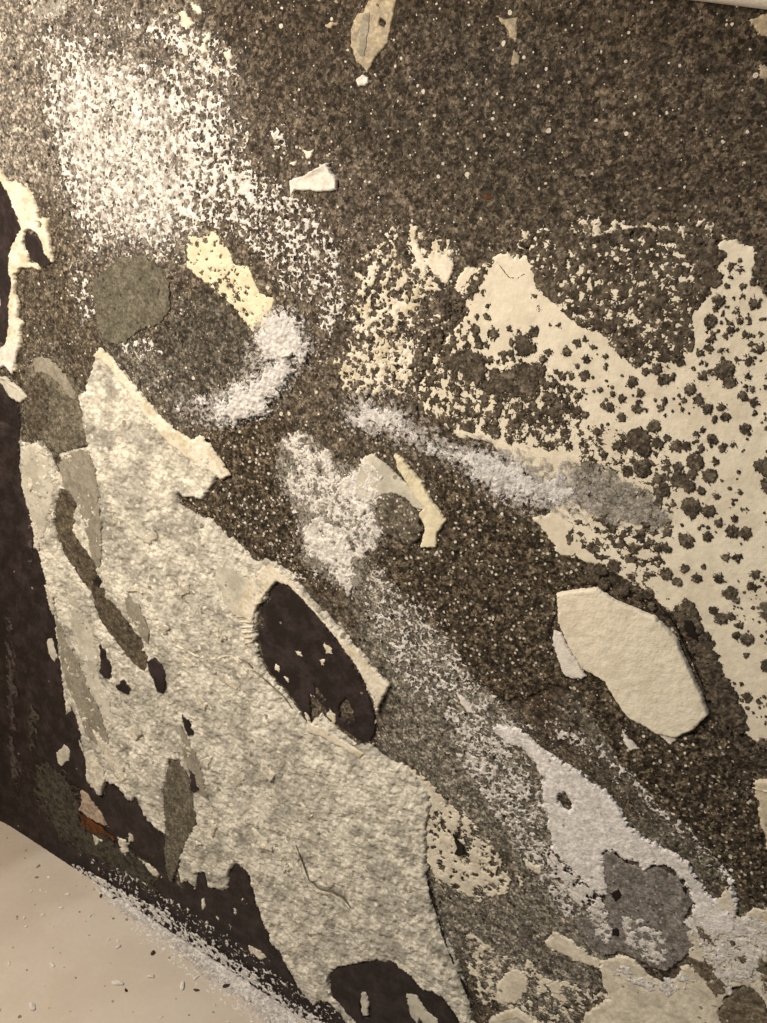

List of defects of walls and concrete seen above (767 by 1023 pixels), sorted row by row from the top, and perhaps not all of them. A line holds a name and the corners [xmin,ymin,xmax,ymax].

damp [117,325,163,361]
damp [5,617,356,1023]
damp [31,0,347,341]
peeling [350,0,396,87]
flaking render [0,347,767,1023]
damp [174,225,767,997]
peeling [333,215,767,749]